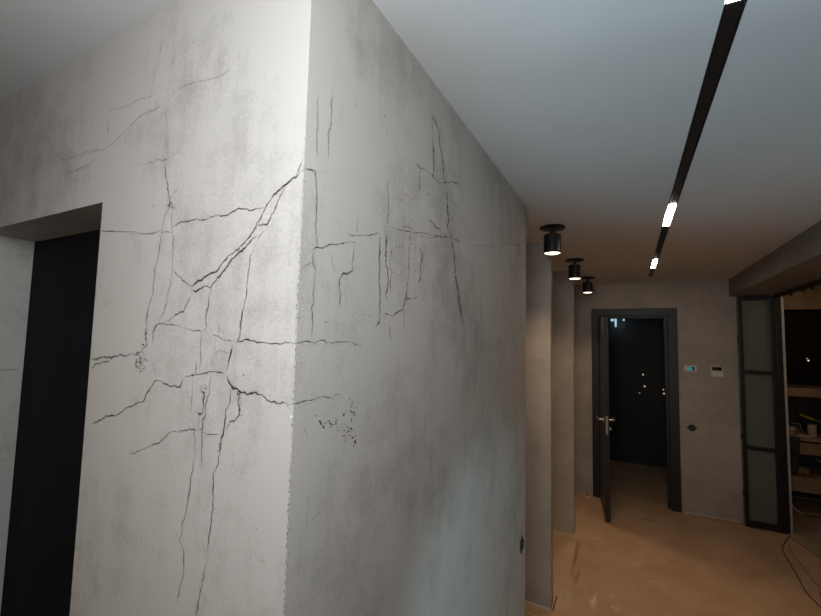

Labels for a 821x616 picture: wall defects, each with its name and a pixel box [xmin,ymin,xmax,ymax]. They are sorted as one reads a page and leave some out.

crack [94,159,359,543]
crack [313,205,463,324]